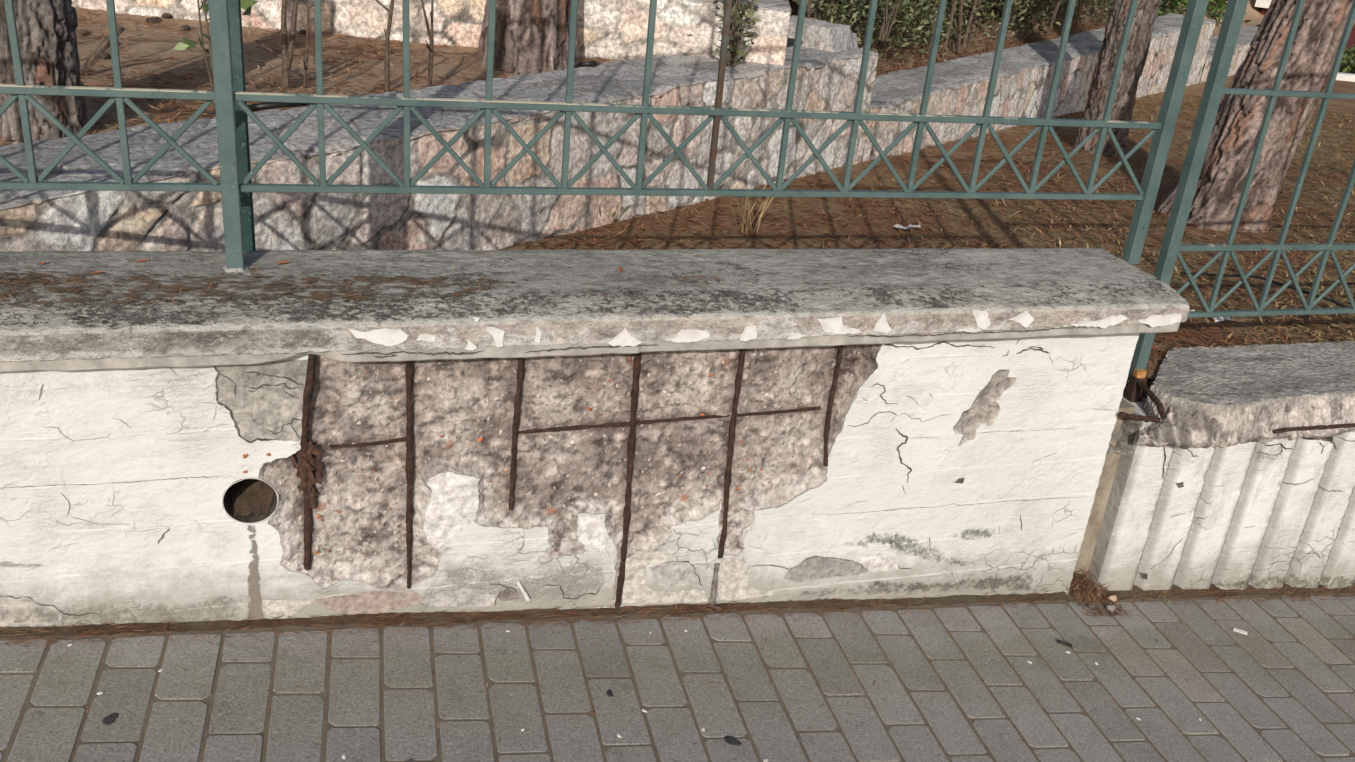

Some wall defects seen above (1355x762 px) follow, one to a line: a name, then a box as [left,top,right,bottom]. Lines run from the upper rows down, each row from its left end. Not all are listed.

crack [851,327,1086,365]
peeling [958,310,991,333]
peeling [1008,310,1034,329]
peeling [1063,313,1182,328]
spalling [953,369,1017,447]
crack [982,409,1108,462]
spalling [258,312,899,614]
crack [754,383,1083,570]